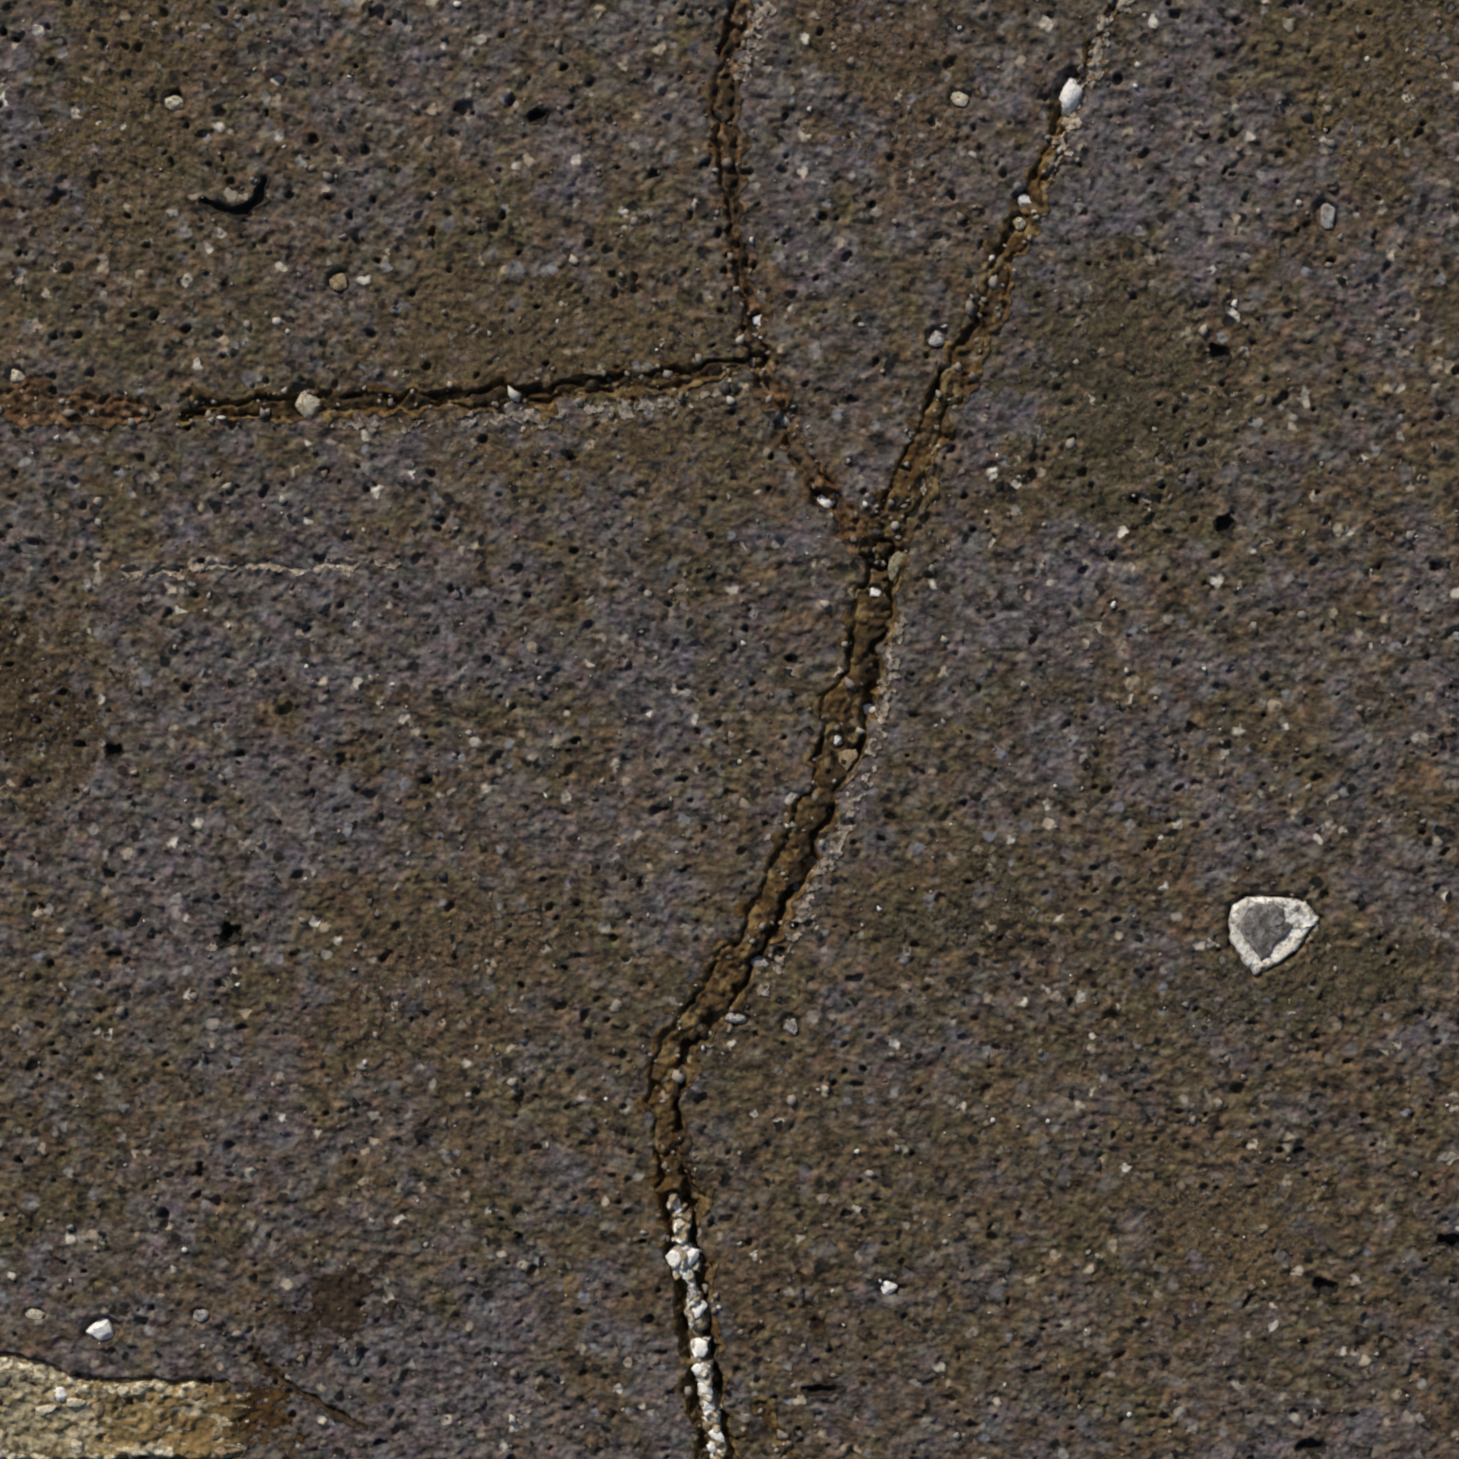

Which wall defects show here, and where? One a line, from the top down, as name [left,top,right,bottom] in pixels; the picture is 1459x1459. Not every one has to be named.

spalling [0,1353,304,1459]
crack [0,0,1134,1459]